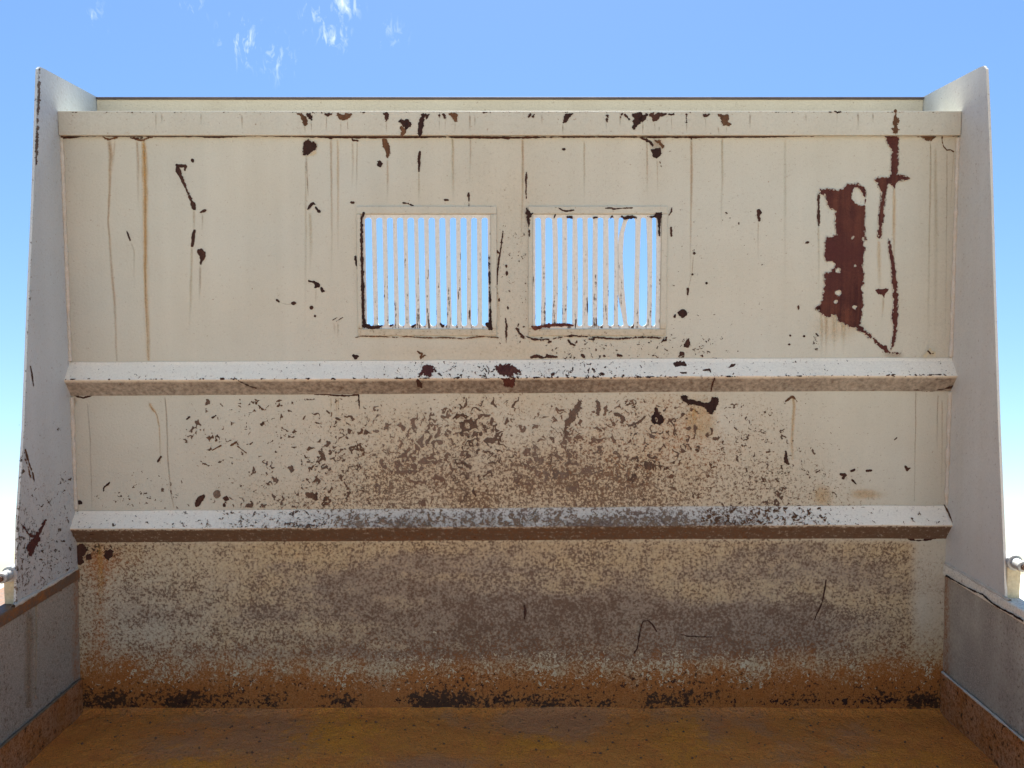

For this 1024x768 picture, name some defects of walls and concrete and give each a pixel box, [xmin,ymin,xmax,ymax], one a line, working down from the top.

peeling [191,229,206,265]
rust [815,109,910,354]
peeling [19,397,883,591]
rust [22,519,47,556]
rust [661,660,936,708]